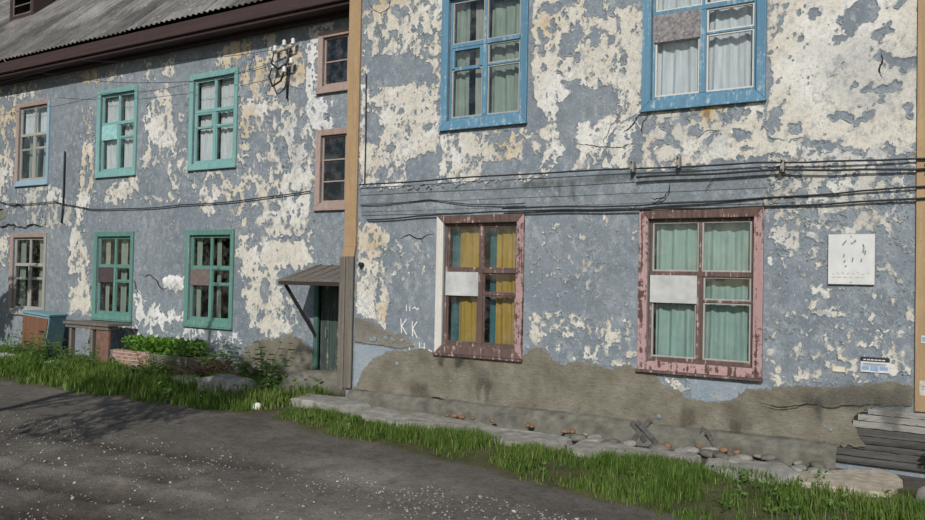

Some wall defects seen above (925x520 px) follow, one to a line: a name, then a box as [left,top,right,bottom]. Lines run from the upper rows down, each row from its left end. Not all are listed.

peeling [0,22,336,378]
peeling [354,0,918,448]